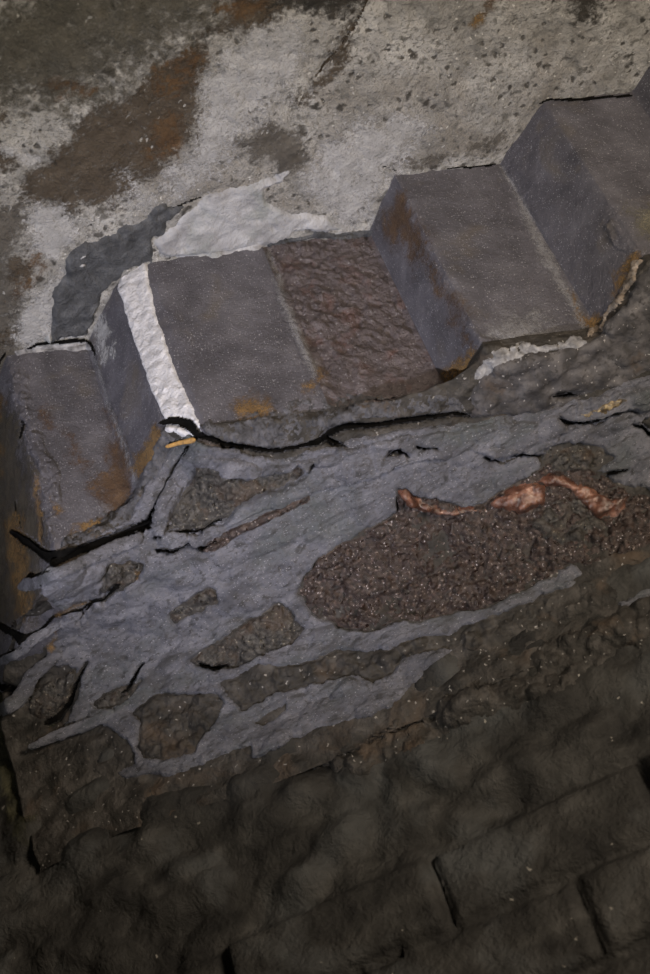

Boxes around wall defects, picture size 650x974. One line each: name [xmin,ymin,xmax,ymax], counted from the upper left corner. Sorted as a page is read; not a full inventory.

water stain [569,0,607,26]
water stain [0,0,507,348]
crack [0,338,95,364]
crack [158,411,472,477]
crack [566,413,650,435]
crack [9,502,222,566]
peeling [0,263,650,779]
corrosion [4,511,33,620]
crack [0,584,120,645]
crack [45,666,86,725]
crack [121,664,143,693]
crack [199,662,226,670]